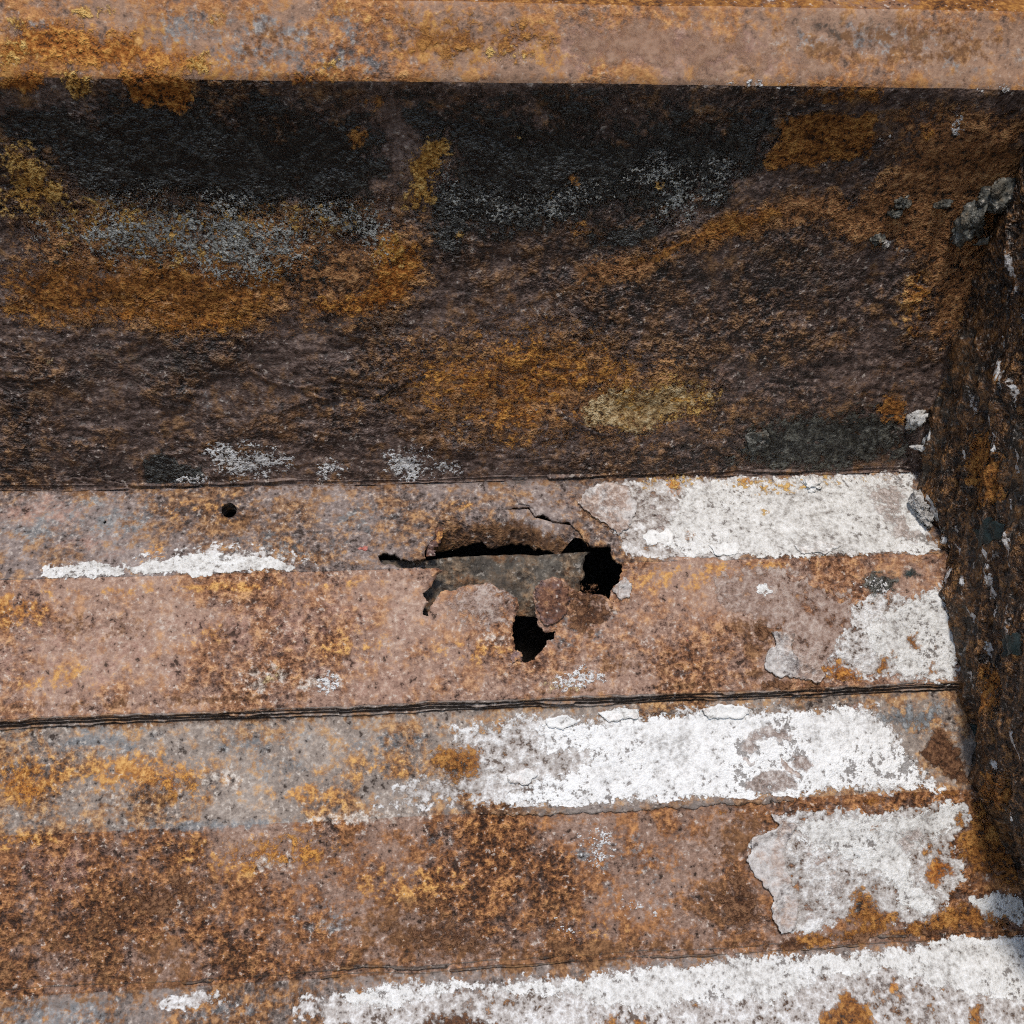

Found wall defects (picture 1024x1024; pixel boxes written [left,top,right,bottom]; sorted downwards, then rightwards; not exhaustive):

rust [347,126,368,149]
rust [0,136,453,336]
rust [579,83,1024,351]
rust [370,316,735,452]
rust [876,395,907,423]
rust [964,431,1007,509]
peeling [510,650,523,663]
peeling [577,470,974,688]
rust [977,663,1003,722]
peeling [981,547,1011,632]
peeling [373,702,972,935]
rust [0,811,1024,990]